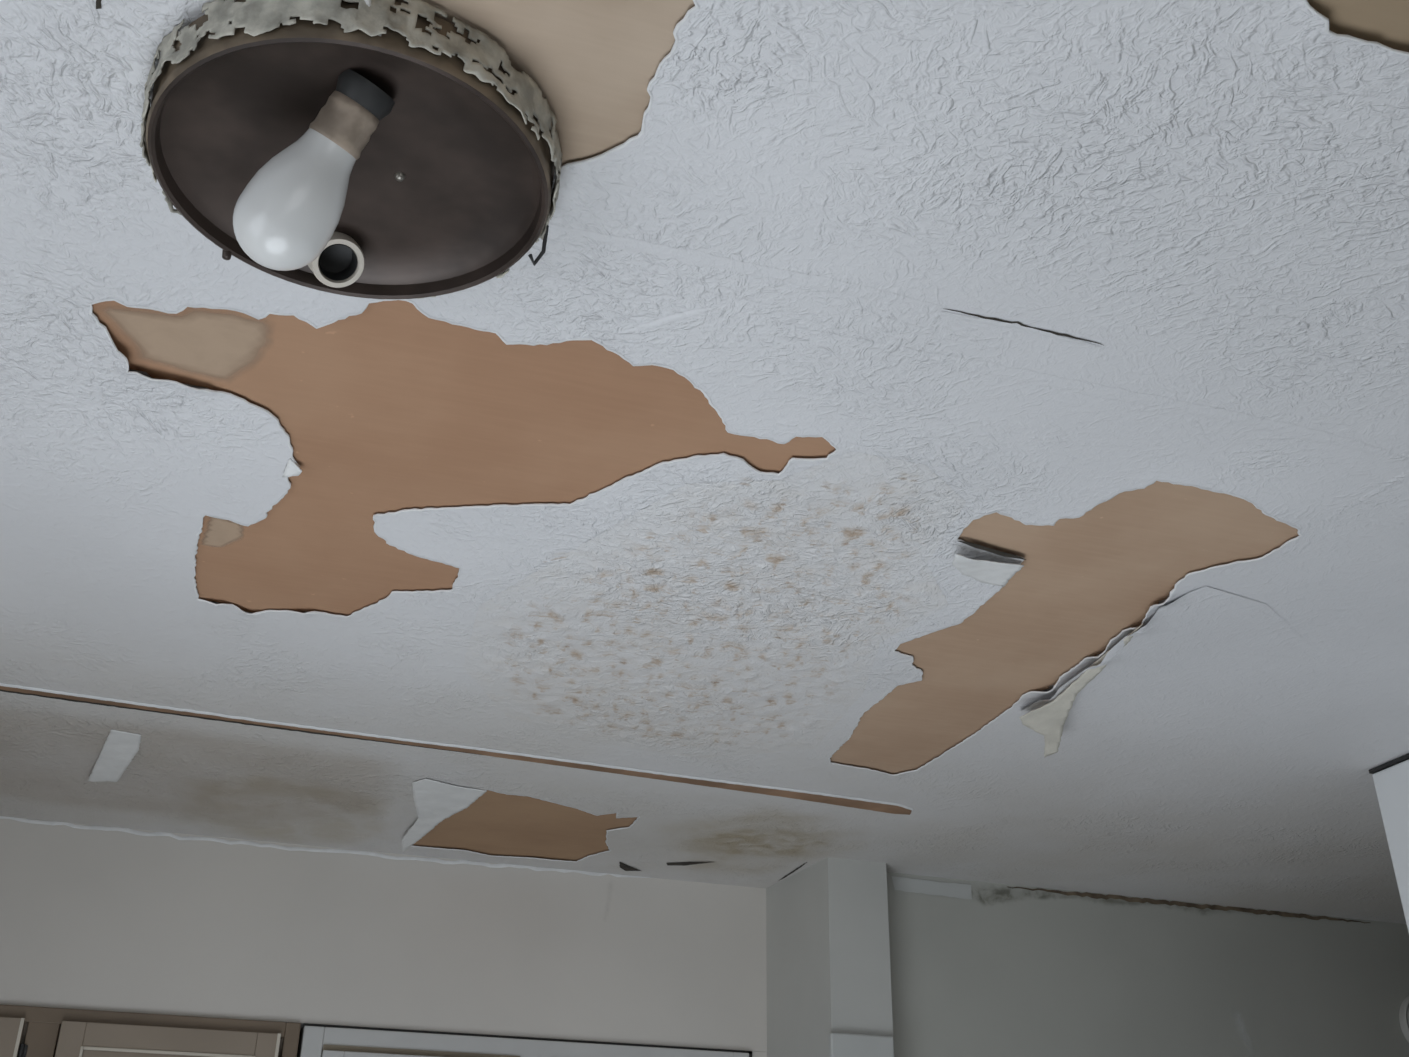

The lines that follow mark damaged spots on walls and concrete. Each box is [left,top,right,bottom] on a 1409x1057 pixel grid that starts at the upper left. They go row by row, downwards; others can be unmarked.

peeling [395,0,699,170]
peeling [1303,0,1409,56]
peeling [89,299,839,618]
peeling [828,479,1302,776]
peeling [401,778,640,862]